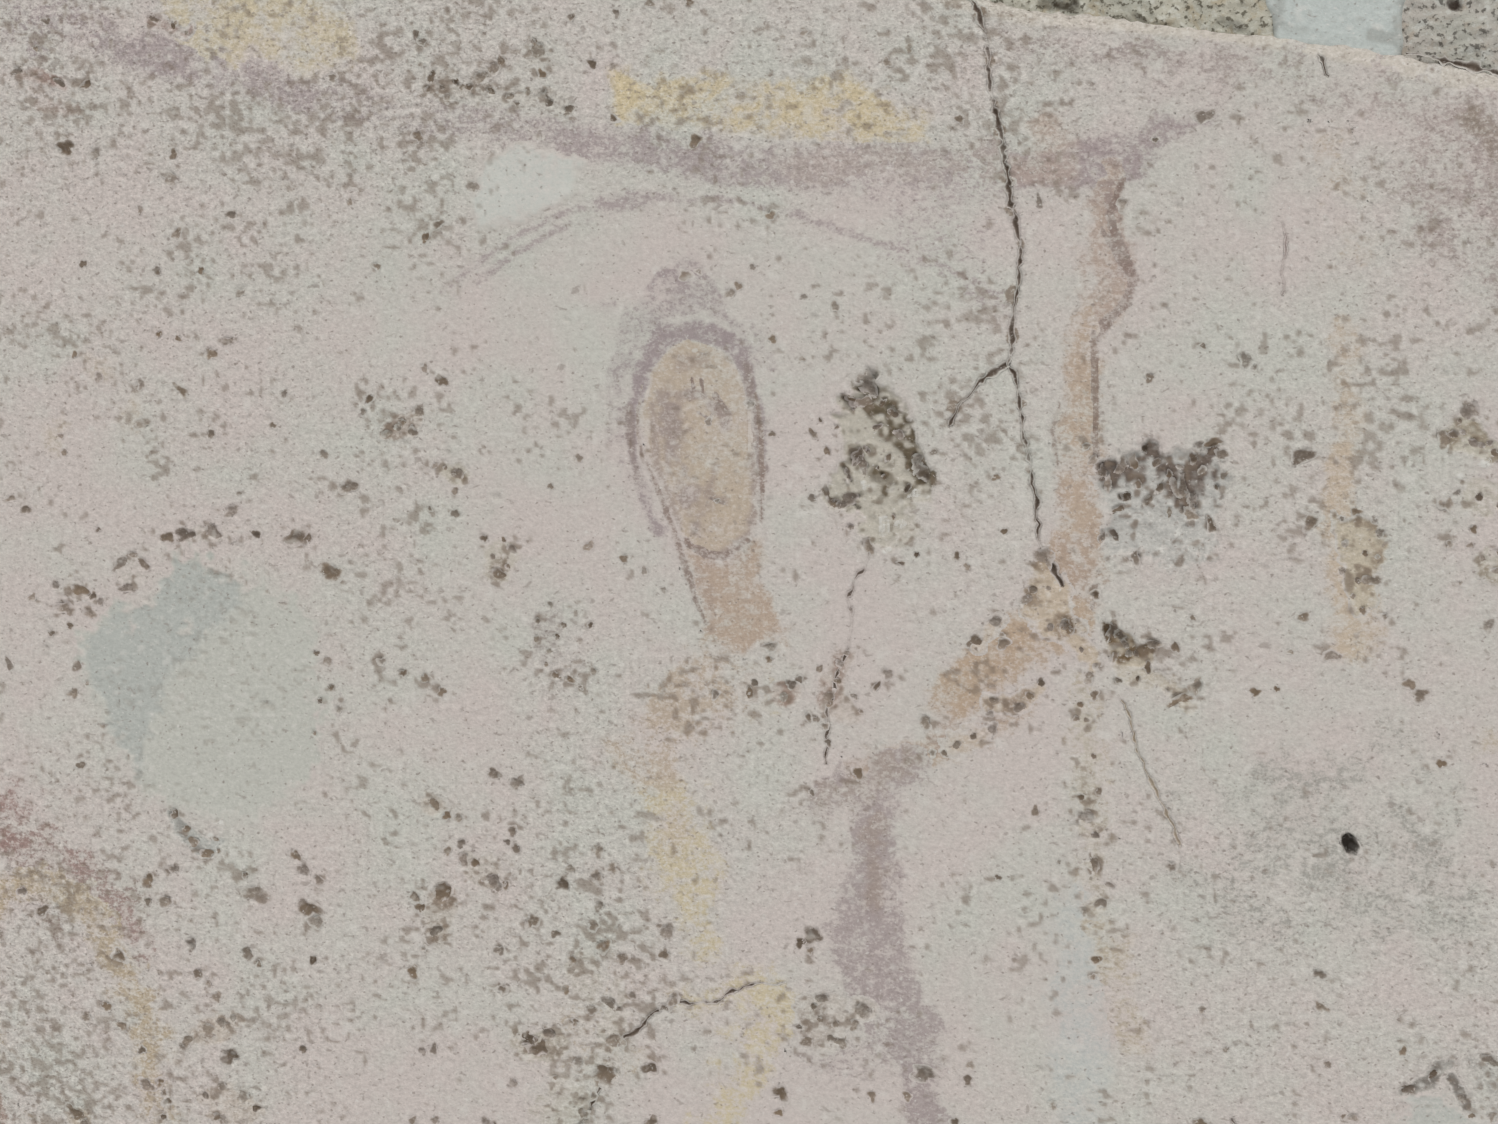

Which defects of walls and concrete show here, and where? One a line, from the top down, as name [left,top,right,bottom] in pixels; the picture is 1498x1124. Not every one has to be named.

crack [945,0,1065,587]
flaking render [807,366,941,566]
flaking render [1081,436,1235,578]